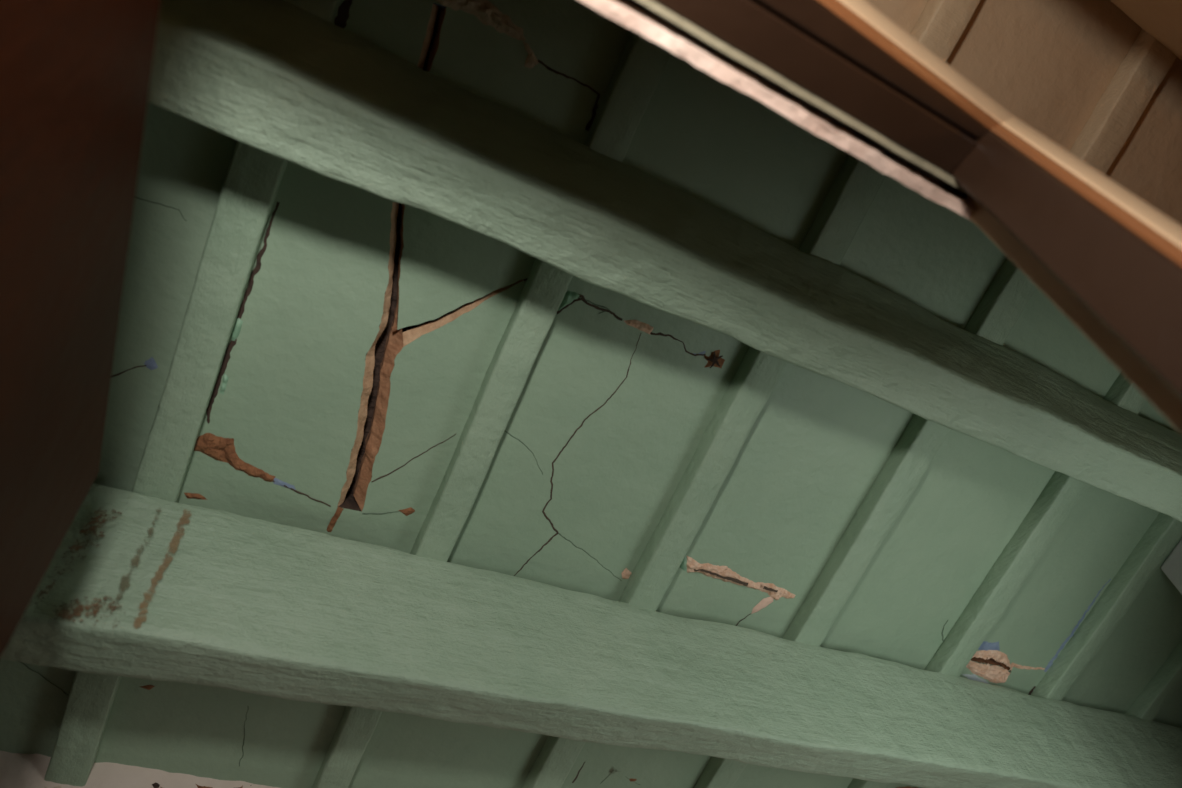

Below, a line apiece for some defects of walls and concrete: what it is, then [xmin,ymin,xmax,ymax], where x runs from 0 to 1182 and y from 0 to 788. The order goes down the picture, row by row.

crack [417,4,446,71]
crack [206,202,280,424]
crack [327,202,527,532]
spalling [194,433,331,507]
crack [505,291,725,581]
damp [117,510,161,600]
spalling [680,555,796,626]
spalling [962,641,1045,684]